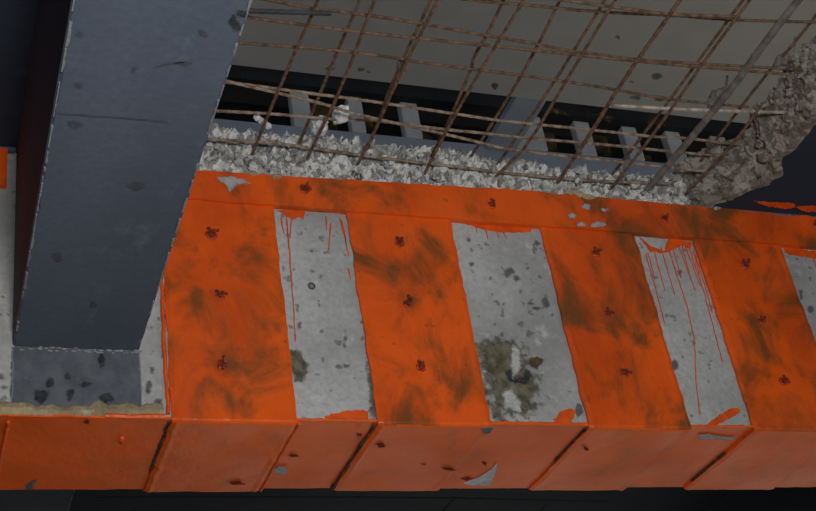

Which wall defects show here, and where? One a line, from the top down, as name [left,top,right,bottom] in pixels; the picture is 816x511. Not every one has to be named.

spalling [197,35,816,210]
peeling [568,213,606,227]
water stain [529,357,543,369]
peeling [464,463,497,486]